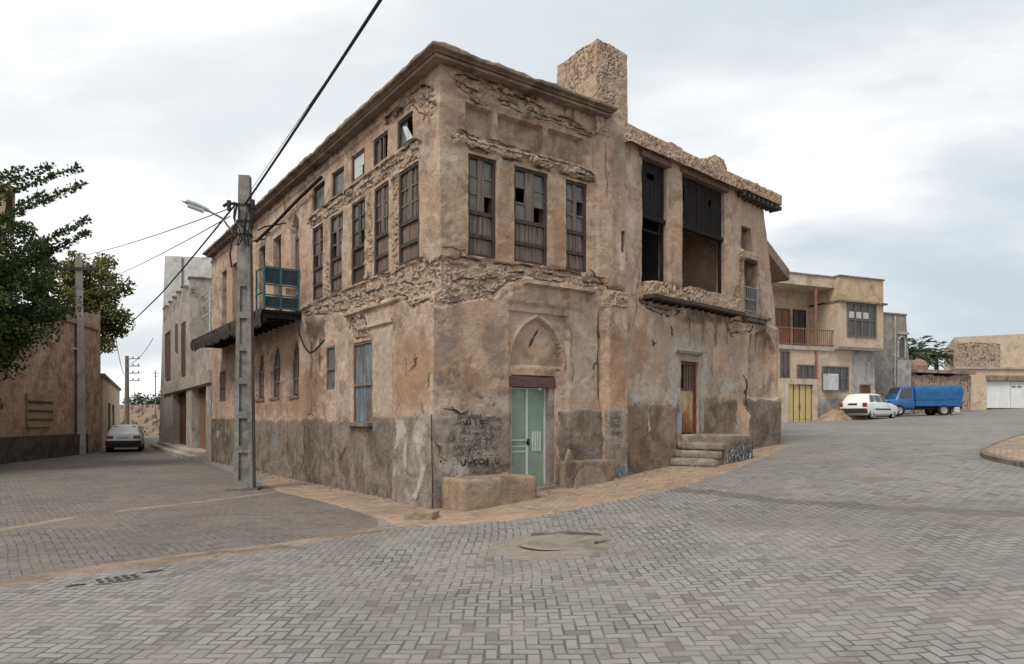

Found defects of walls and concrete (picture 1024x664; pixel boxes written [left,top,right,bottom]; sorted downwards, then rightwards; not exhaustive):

flaking render [382,83,437,125]
flaking render [448,72,596,137]
flaking render [449,128,596,182]
flaking render [302,139,682,340]
crack [569,314,600,406]
water stain [408,455,468,498]